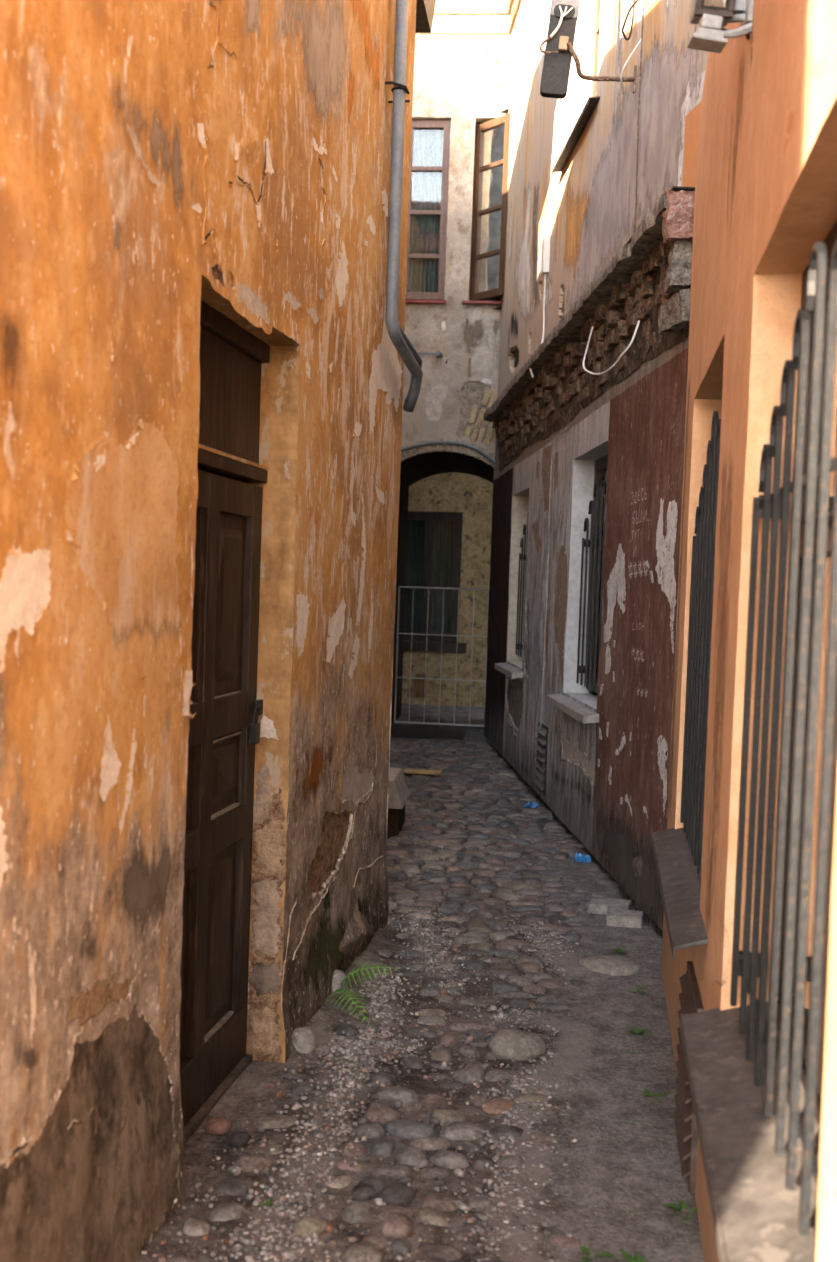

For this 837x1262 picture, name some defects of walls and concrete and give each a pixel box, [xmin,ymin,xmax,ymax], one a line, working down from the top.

crack [207,0,237,68]
peeling [208,211,349,335]
peeling [352,291,403,439]
spalling [424,69,706,735]
peeling [0,418,196,719]
peeling [325,485,385,685]
peeling [0,715,15,913]
peeling [94,721,137,835]
leakage [123,843,171,929]
crack [281,783,384,1013]
leakage [18,1041,38,1069]
flaking render [0,962,184,1262]